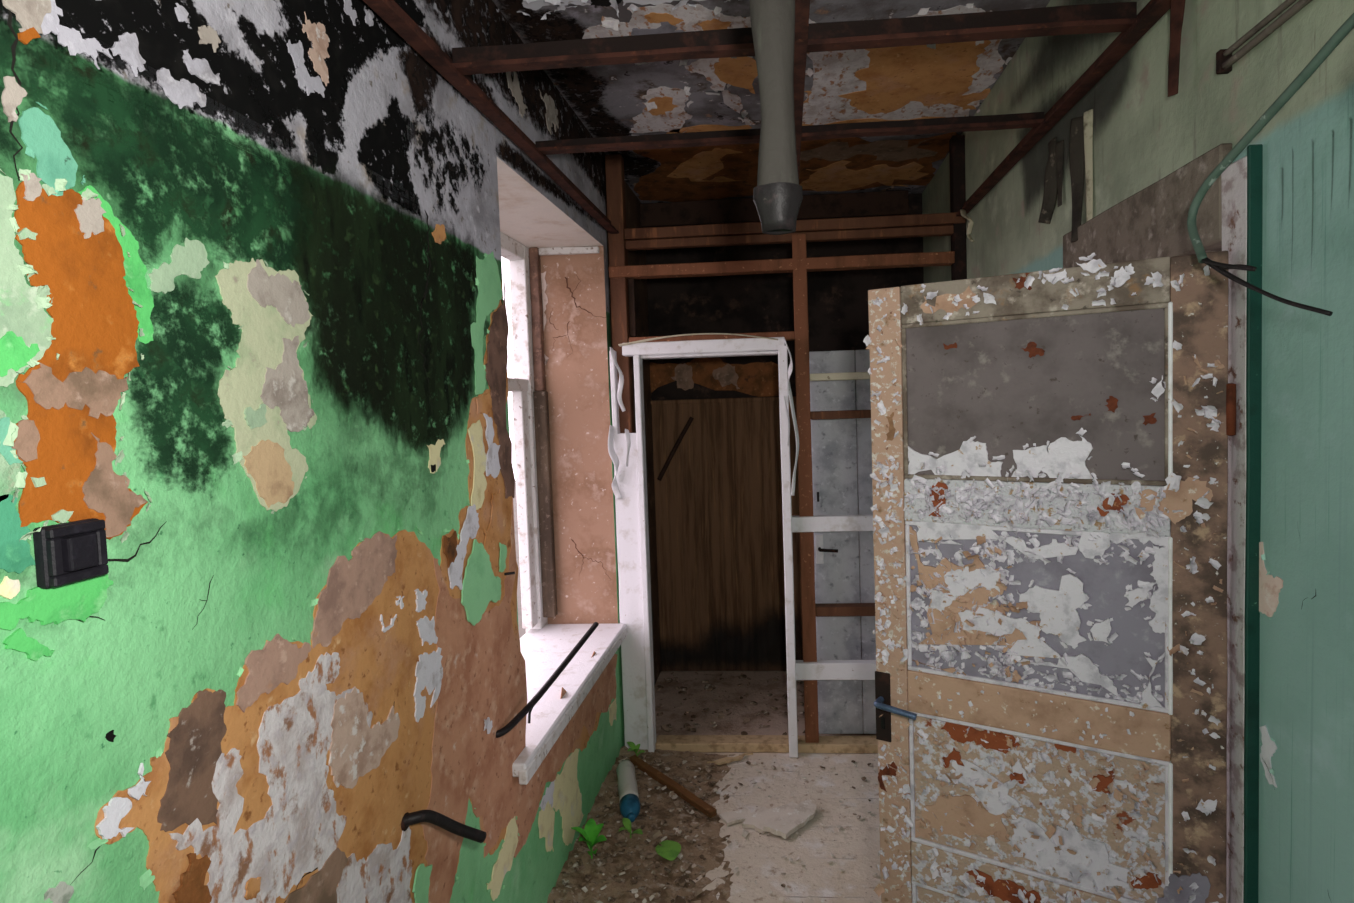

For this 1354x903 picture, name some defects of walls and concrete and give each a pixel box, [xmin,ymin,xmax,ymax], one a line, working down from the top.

peeling [517,0,751,39]
leakage [467,67,661,204]
peeling [629,56,759,202]
peeling [799,39,1012,192]
leakage [0,0,604,452]
peeling [0,76,317,599]
leakage [128,284,242,491]
crack [108,521,167,562]
flaking render [87,251,617,903]
peeling [1259,542,1283,619]